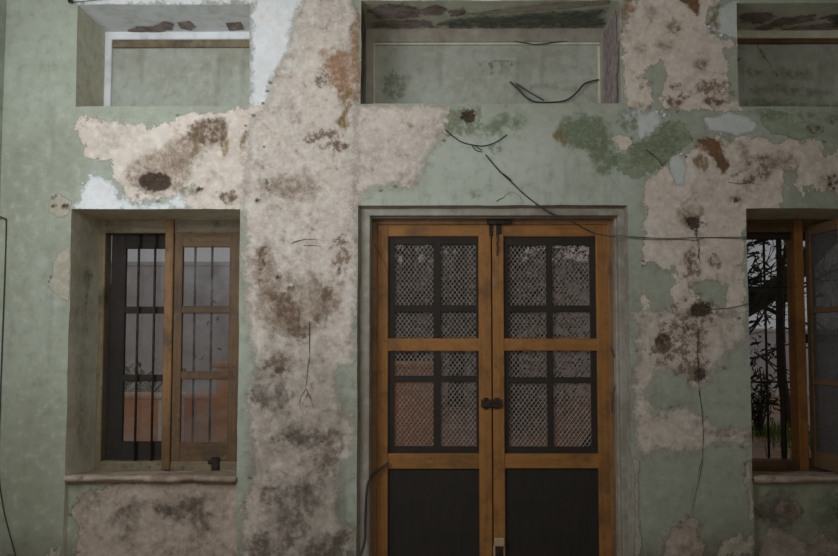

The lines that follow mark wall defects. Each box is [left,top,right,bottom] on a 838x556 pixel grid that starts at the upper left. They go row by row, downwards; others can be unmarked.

leakage [438,10,605,29]
corrosion [681,0,700,16]
corrosion [316,14,366,127]
corrosion [693,137,730,173]
peeling [47,0,480,556]
leakage [255,247,336,338]
leakage [333,234,350,275]
peeling [367,0,838,457]
crack [299,321,314,408]
leakage [649,321,710,382]
crack [691,328,704,515]
peeling [717,459,838,556]